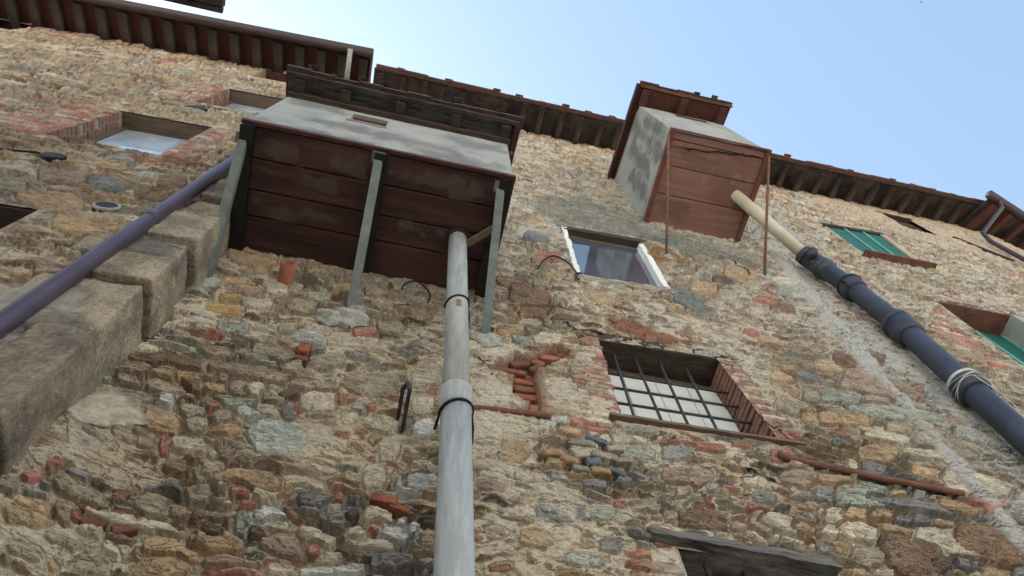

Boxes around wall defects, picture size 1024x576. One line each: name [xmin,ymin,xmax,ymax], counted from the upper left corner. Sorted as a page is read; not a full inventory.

crack [675,145,763,159]
rust [646,246,688,264]